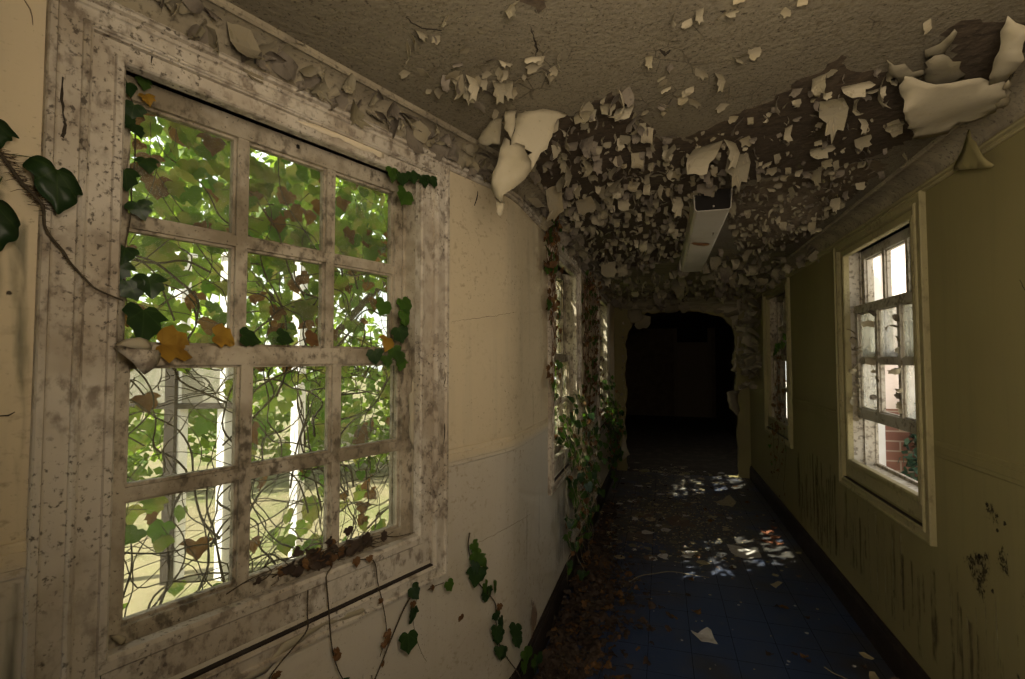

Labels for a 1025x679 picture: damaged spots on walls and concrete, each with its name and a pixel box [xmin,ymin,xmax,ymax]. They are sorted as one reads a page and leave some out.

peeling [156,0,1025,372]
peeling [114,337,161,375]
peeling [847,309,903,421]
water stain [966,547,1008,598]